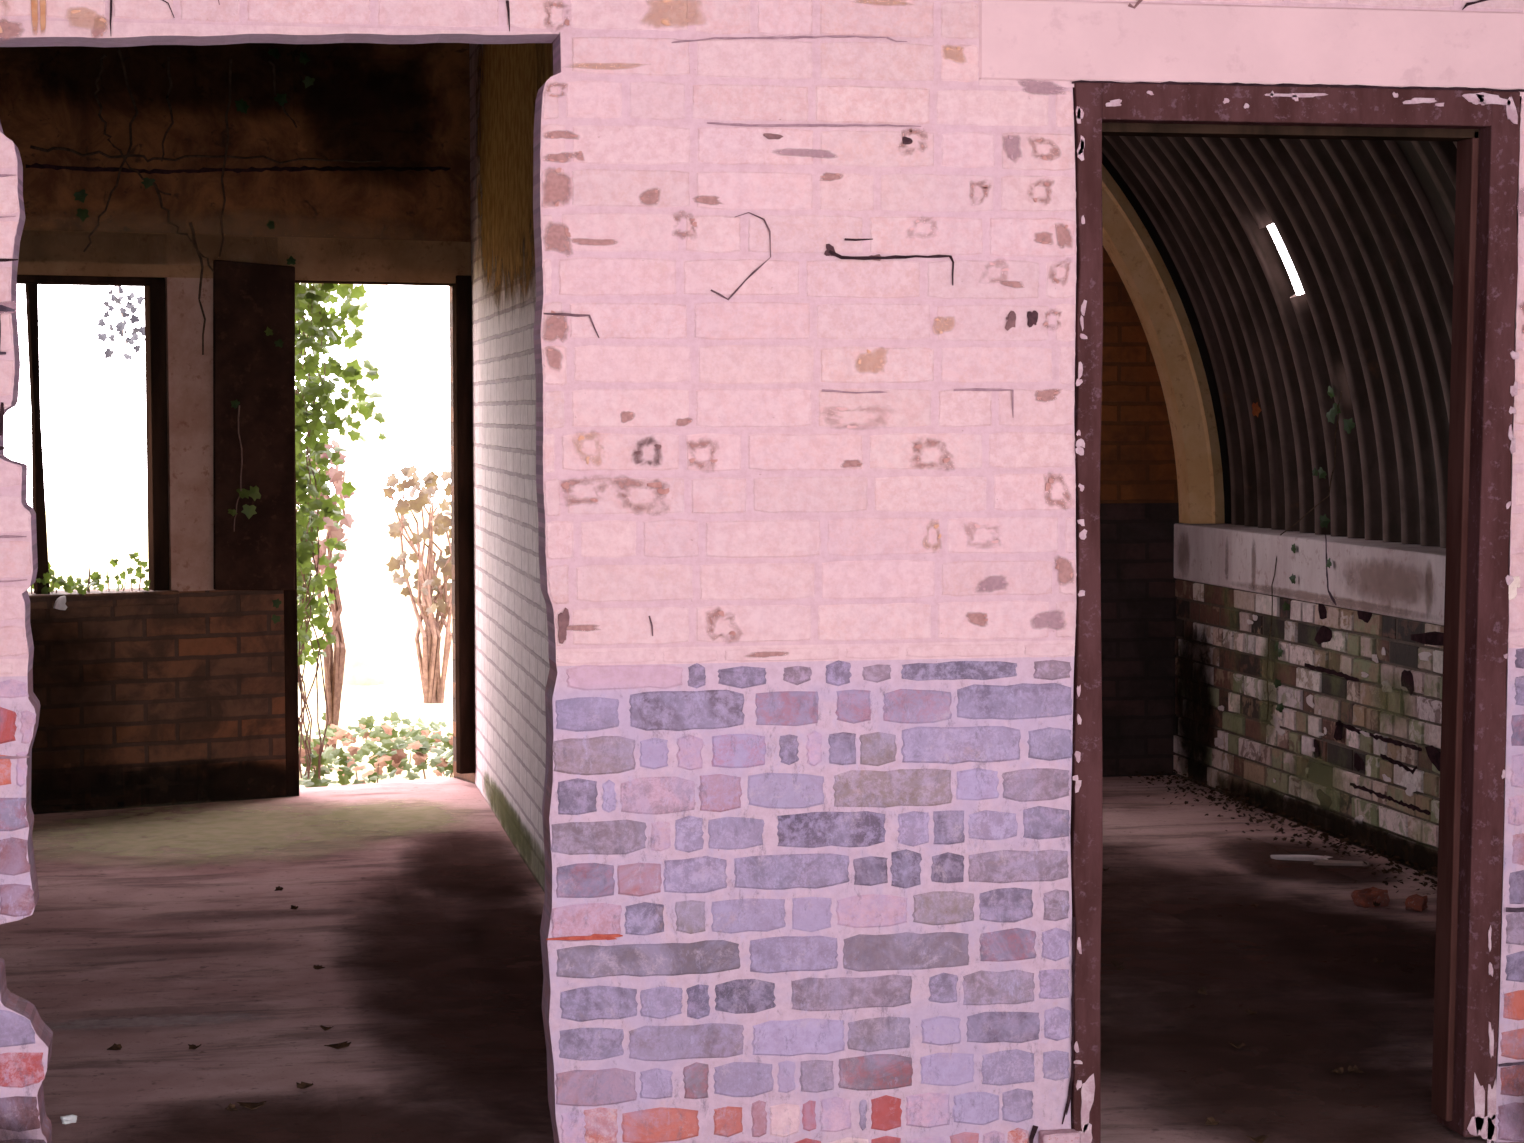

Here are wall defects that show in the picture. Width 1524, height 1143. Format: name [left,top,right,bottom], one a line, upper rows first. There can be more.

crack [107,0,115,34]
crack [504,0,512,31]
crack [1462,0,1487,10]
crack [1072,80,1524,92]
crack [0,163,354,177]
crack [711,212,771,300]
crack [829,238,954,285]
crack [0,305,15,355]
crack [0,402,8,450]
peeling [561,438,669,511]
peeling [689,441,718,468]
damp [1249,548,1431,615]